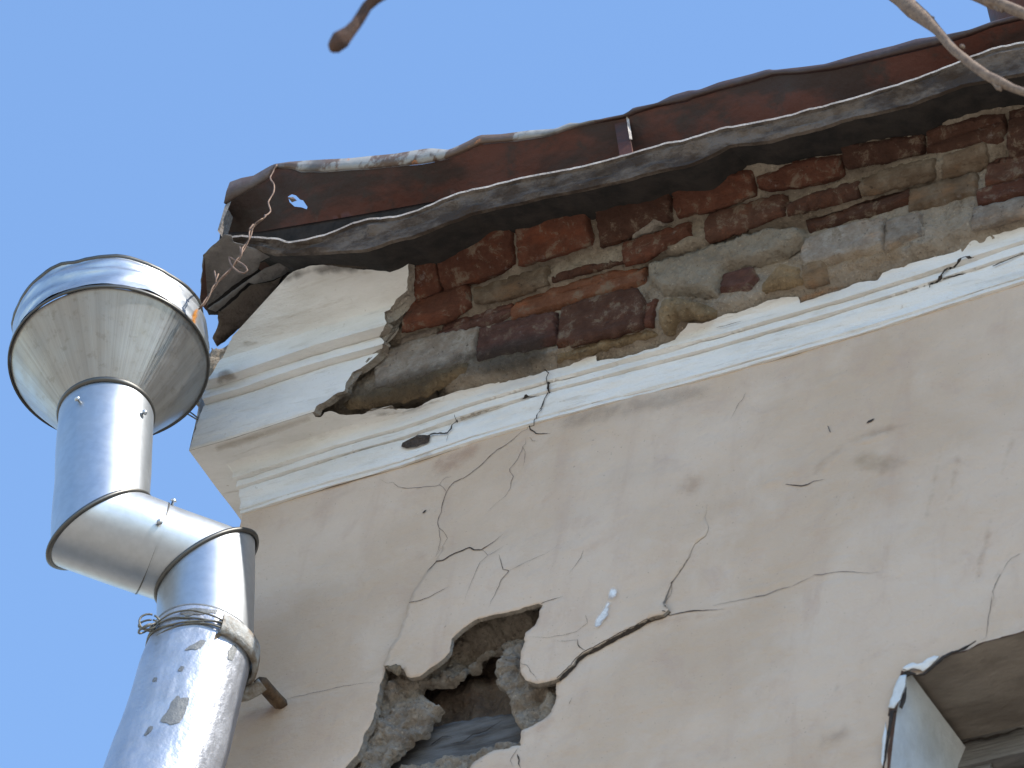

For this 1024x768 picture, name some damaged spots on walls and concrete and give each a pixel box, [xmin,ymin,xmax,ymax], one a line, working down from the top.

spalling [318,105,1024,417]
crack [929,253,1023,288]
spalling [209,344,229,377]
crack [391,369,550,603]
spalling [354,608,557,768]
crack [523,559,879,703]
peeling [881,641,976,768]